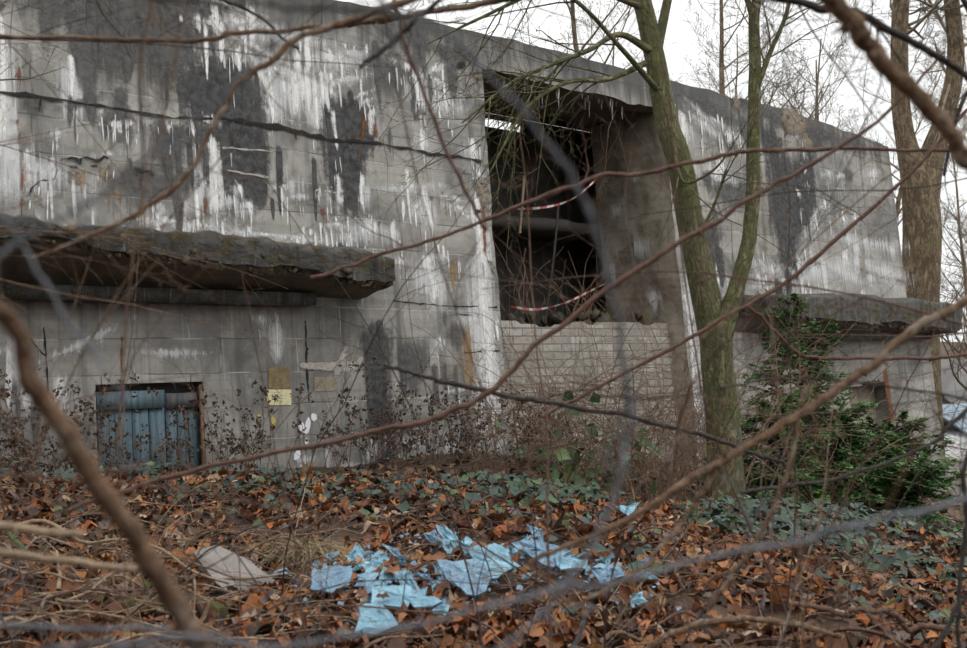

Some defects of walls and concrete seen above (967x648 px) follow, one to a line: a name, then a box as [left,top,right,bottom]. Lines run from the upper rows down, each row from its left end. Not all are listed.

damp [0,0,507,468]
damp [678,94,747,293]
damp [752,106,910,294]